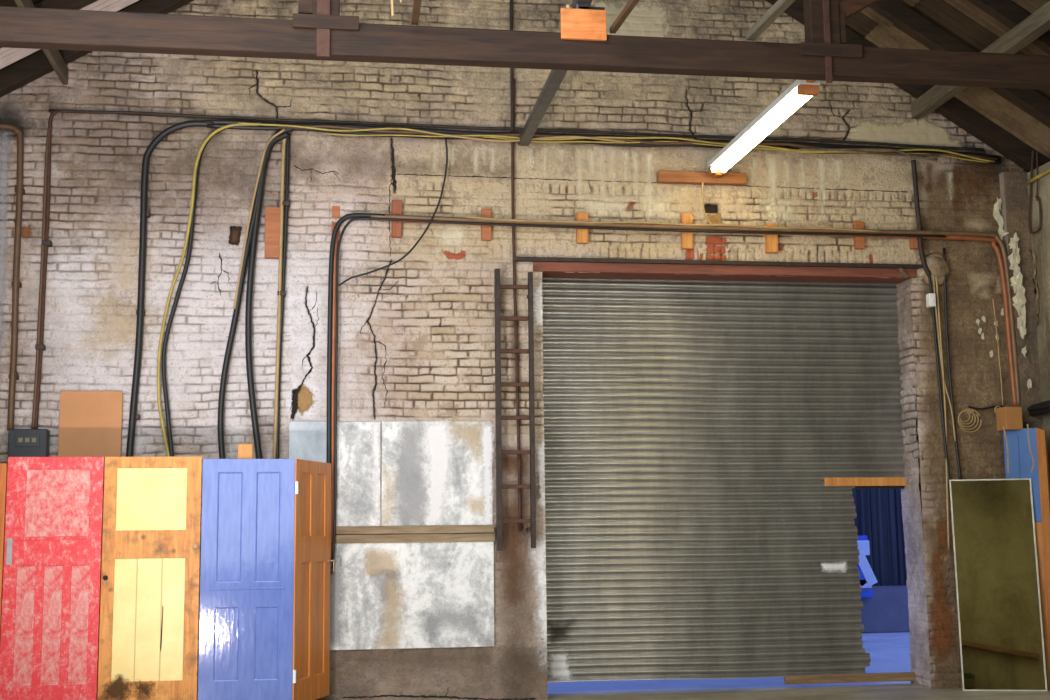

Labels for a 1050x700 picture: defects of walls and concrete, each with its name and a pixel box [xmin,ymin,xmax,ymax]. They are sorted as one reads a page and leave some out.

crack [725,184,907,192]
spalling [443,250,465,260]
crack [360,138,657,419]
peeling [957,197,1039,357]
spalling [290,384,314,419]
crack [290,287,319,419]